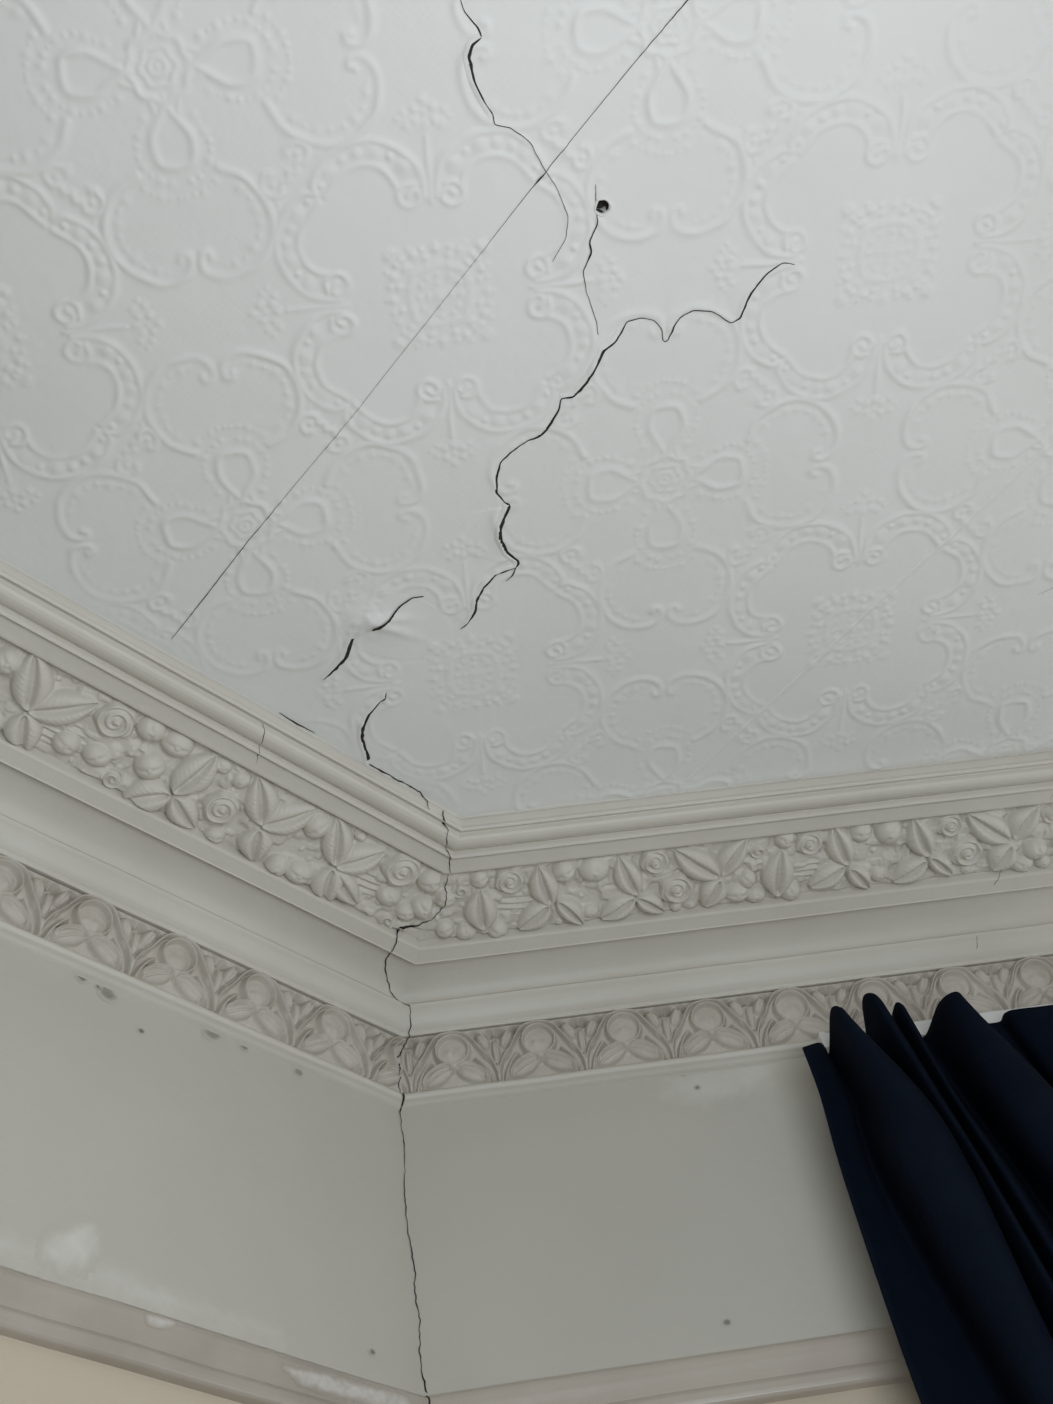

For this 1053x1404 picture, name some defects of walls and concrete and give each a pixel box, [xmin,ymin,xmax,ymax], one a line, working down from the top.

crack [460,0,795,629]
crack [319,596,424,680]
crack [357,693,451,1404]